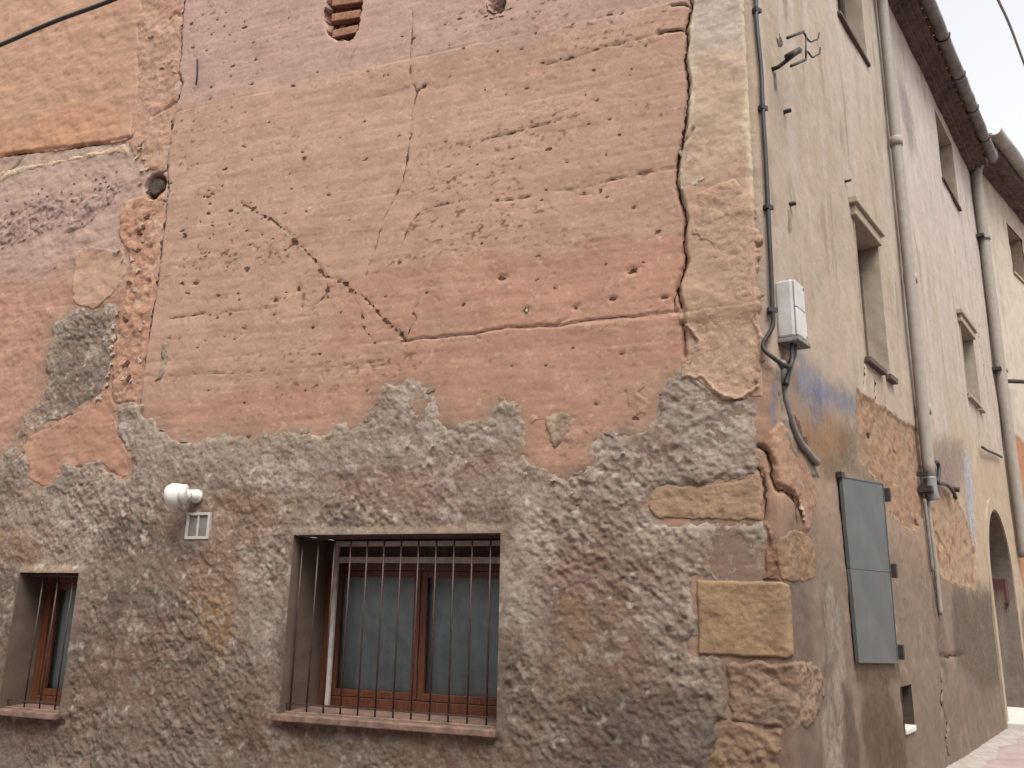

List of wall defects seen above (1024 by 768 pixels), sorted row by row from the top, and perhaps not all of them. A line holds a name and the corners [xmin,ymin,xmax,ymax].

crack [241,0,693,367]
peeling [0,0,767,768]
spalling [855,388,977,591]